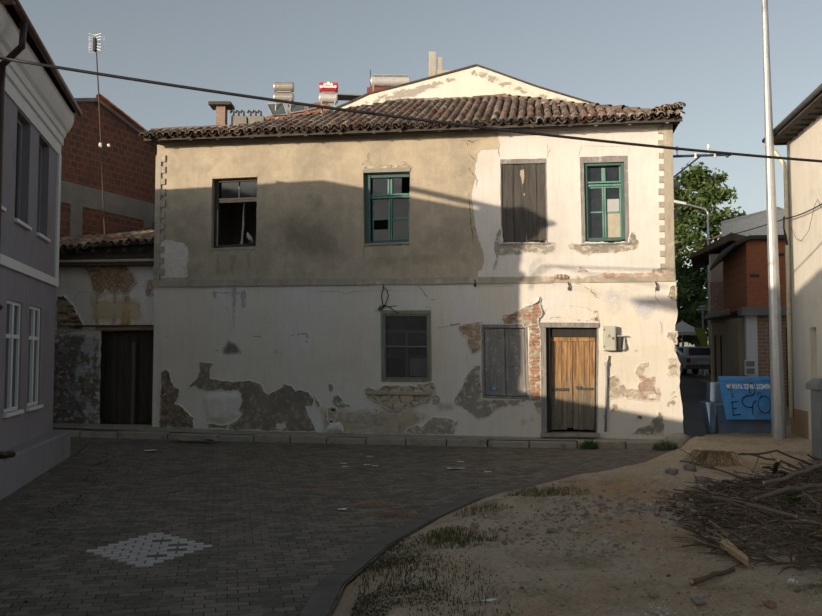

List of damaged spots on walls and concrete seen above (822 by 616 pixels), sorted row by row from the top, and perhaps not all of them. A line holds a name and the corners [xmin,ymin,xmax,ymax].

flaking render [83,262,154,297]
flaking render [457,321,483,355]
flaking render [501,296,544,407]
flaking render [666,330,678,345]
peeling [158,361,352,433]
flaking render [365,381,441,412]
flaking render [607,356,679,414]
peeling [404,416,459,435]